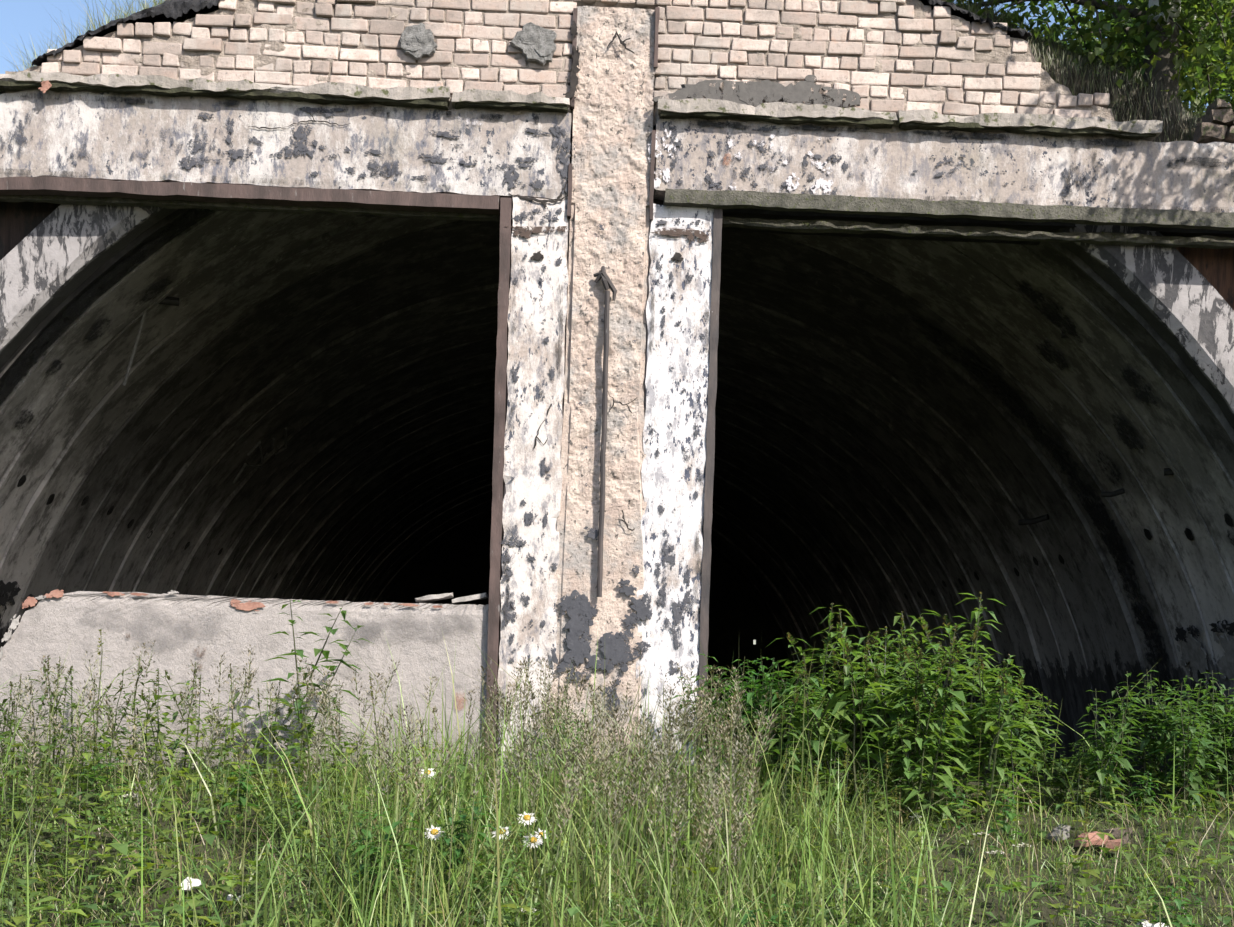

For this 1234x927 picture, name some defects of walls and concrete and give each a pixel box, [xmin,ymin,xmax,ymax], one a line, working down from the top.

crack [607,31,634,53]
peeling [179,106,478,181]
peeling [648,121,848,195]
peeling [931,147,975,177]
peeling [1062,158,1104,206]
peeling [650,217,709,244]
peeling [514,254,563,285]
peeling [524,314,557,400]
peeling [652,254,702,479]